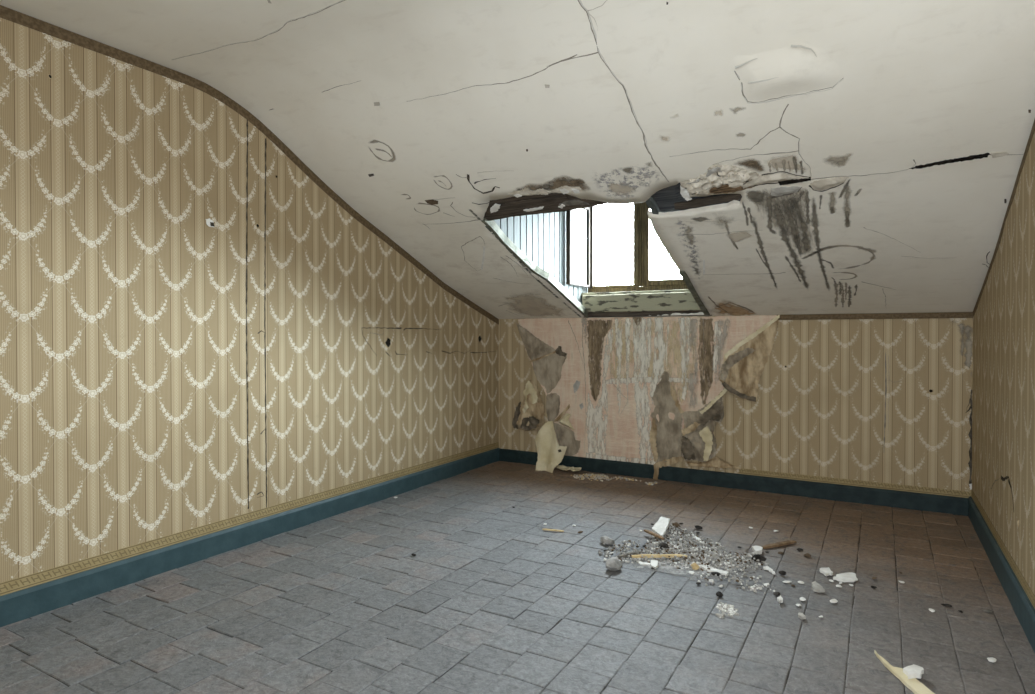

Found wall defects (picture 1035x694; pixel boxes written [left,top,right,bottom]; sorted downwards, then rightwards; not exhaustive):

crack [173,0,345,60]
crack [411,0,1022,182]
flaking render [490,186,582,213]
flaking render [680,164,848,201]
leakage [739,156,804,174]
crack [425,171,565,318]
leakage [677,217,707,273]
leakage [720,180,875,307]
flaking render [518,315,777,465]